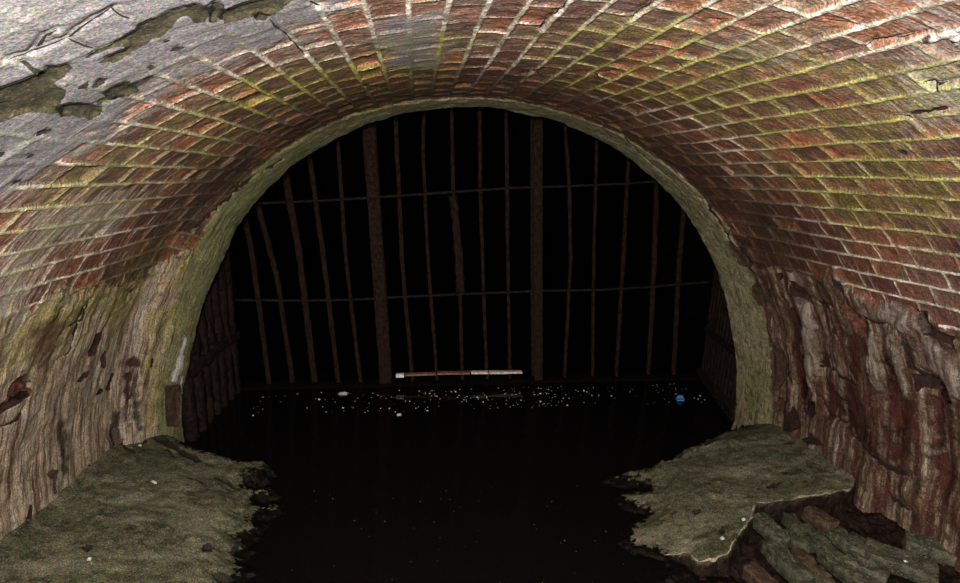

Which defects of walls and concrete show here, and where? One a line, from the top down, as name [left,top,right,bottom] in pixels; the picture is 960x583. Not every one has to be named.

crack [6,6,129,61]
peeling [86,0,293,63]
peeling [0,60,155,122]
spalling [776,271,812,299]
spalling [915,308,960,349]
spalling [0,374,32,426]
damp [57,421,70,476]
damp [108,411,120,446]
damp [132,401,143,431]
spalling [770,340,822,445]
spalling [912,374,949,448]